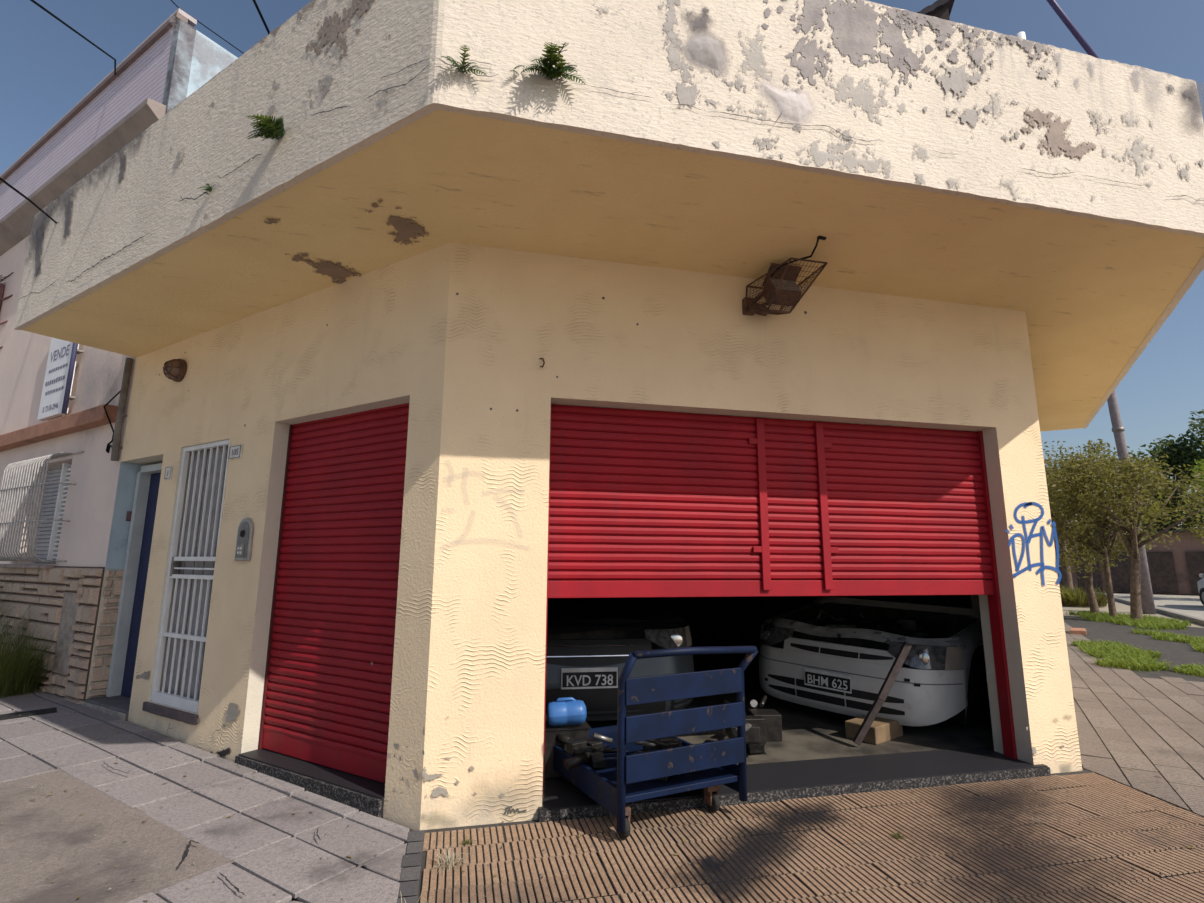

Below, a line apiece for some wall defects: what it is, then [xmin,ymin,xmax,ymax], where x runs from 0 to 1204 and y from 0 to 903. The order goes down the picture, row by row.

peeling [306,0,374,108]
crack [309,55,499,116]
crack [574,83,883,142]
peeling [658,0,1204,186]
water stain [29,131,143,277]
peeling [386,207,429,245]
crack [1022,168,1203,201]
peeling [285,253,362,284]
spalling [392,750,459,799]